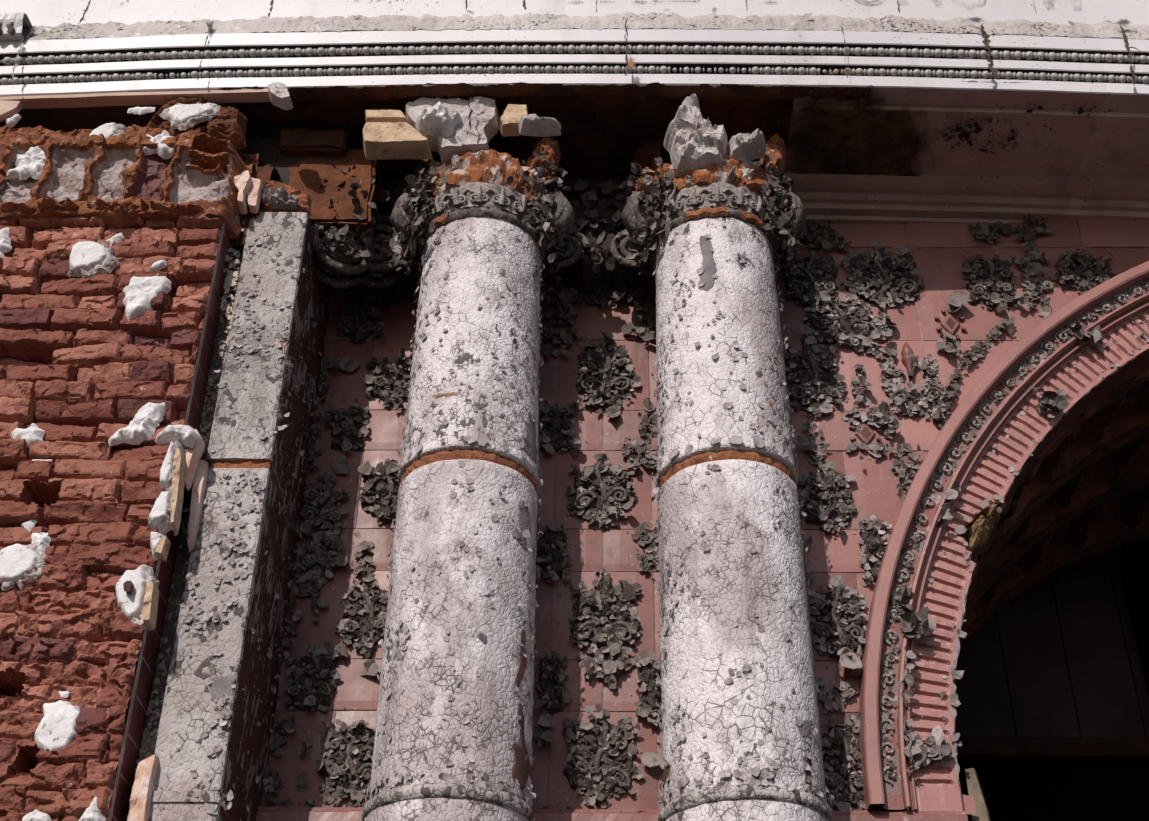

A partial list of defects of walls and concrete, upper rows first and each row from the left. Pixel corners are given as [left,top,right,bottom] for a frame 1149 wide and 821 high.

crack [980,24,1001,80]
spalling [0,124,263,239]
peeling [381,184,413,216]
peeling [554,180,656,275]
spalling [155,448,193,561]
spalling [142,582,159,631]
peeling [180,580,238,634]
peeling [134,688,165,771]
peeling [190,767,249,821]